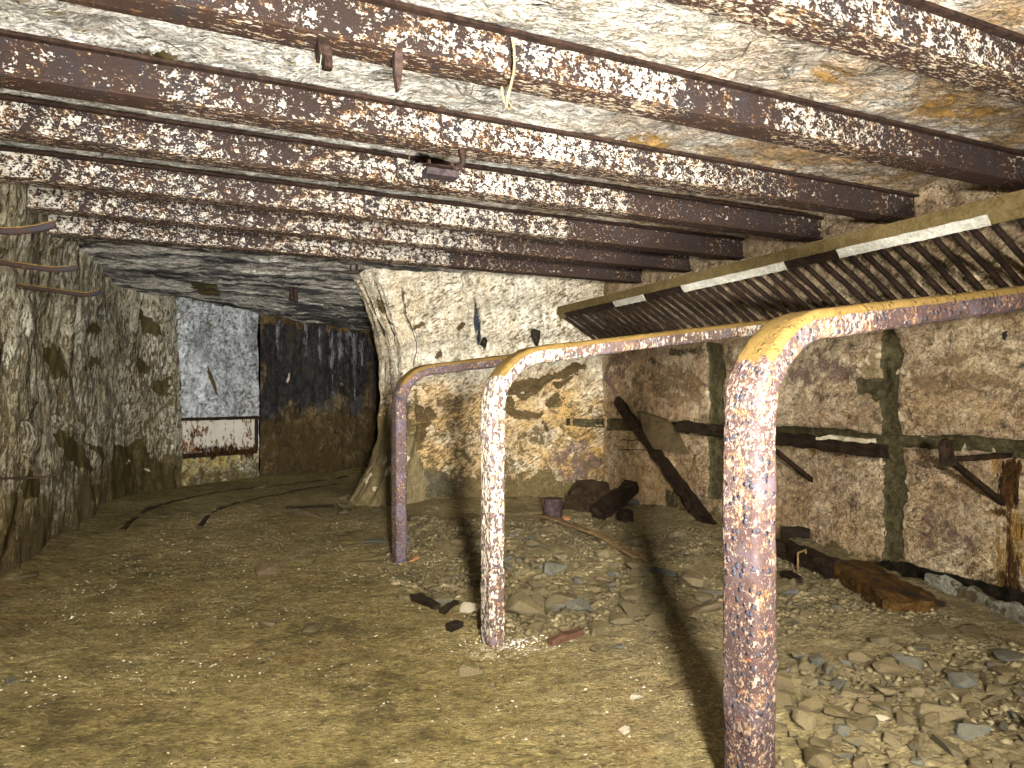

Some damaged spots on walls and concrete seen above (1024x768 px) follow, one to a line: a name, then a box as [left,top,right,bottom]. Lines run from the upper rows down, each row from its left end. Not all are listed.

leakage [304,324,364,401]
corrosion [183,444,256,463]